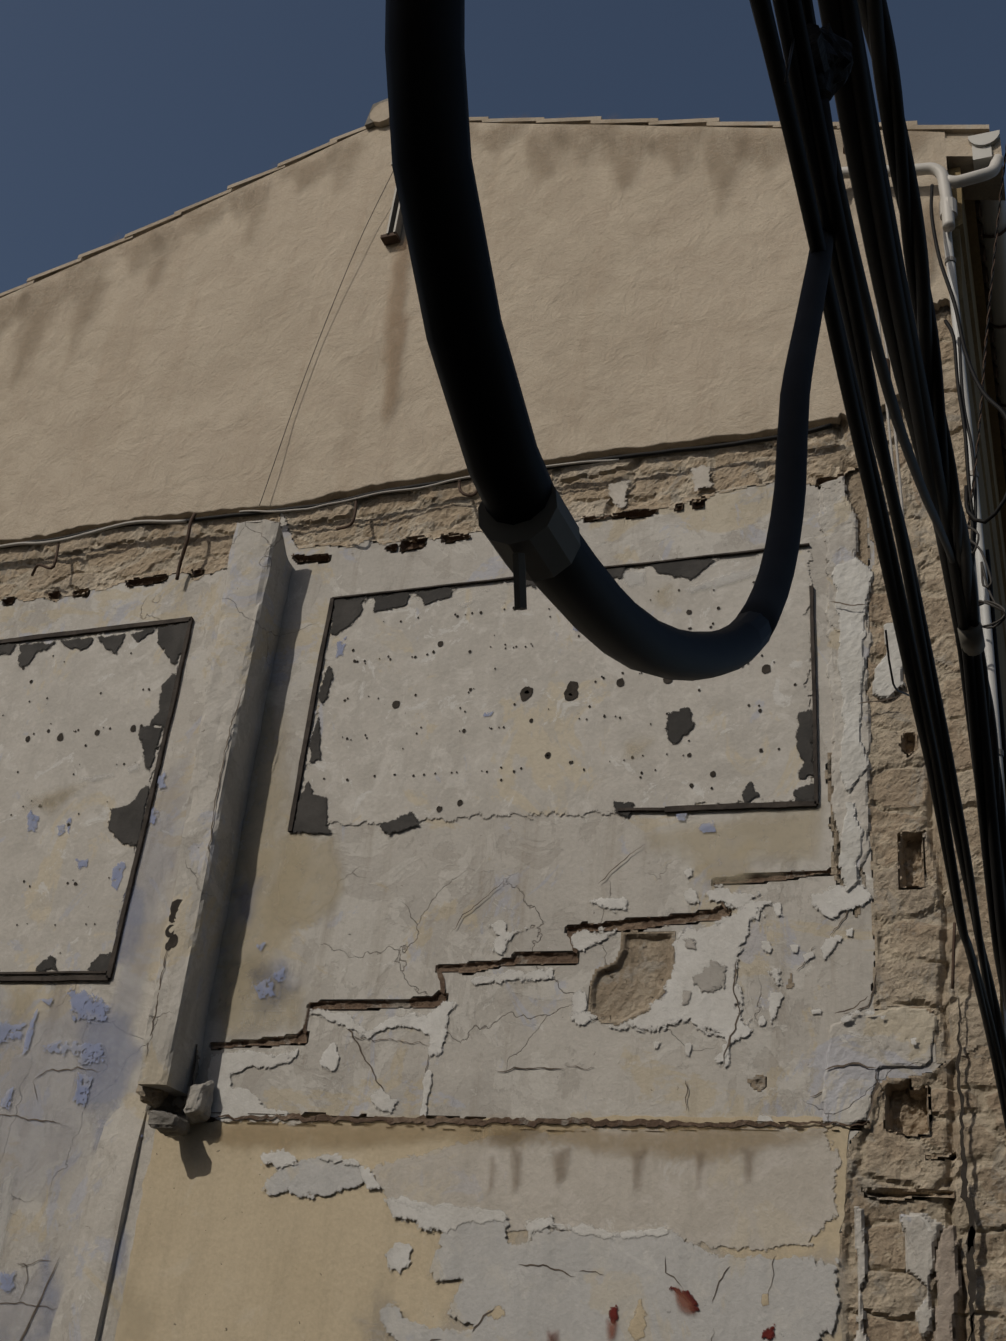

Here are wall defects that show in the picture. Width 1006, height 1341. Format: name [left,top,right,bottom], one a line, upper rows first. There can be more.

flaking render [935,305,971,537]
spalling [0,622,188,846]
peeling [108,861,126,891]
spalling [35,952,61,972]
peeling [67,952,112,1023]
peeling [0,998,105,1109]
peeling [145,1044,314,1127]
crack [0,1259,59,1341]